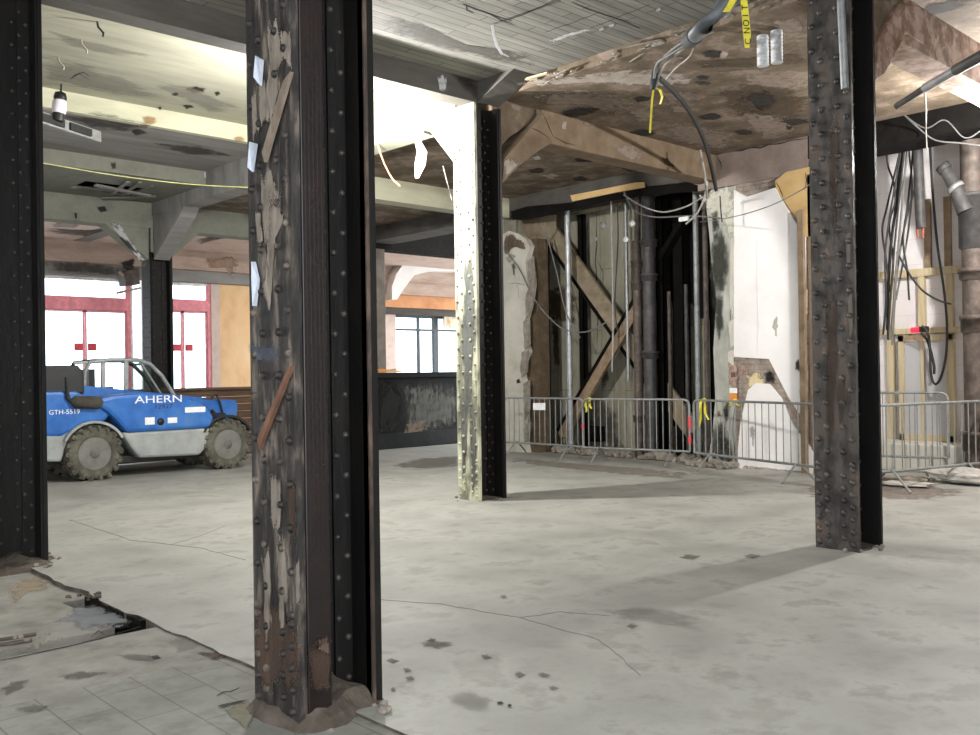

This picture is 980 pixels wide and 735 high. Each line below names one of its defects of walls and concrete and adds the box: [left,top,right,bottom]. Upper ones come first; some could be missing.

peeling [526,57,808,172]
leakage [699,57,757,68]
leakage [721,84,806,119]
leakage [769,54,803,65]
peeling [255,169,283,309]
leakage [710,212,728,338]
spalling [699,186,811,473]
corrosion [826,301,845,442]
peeling [261,475,301,639]
spalling [85,596,146,635]
corrosion [256,607,330,690]
crack [389,600,641,676]